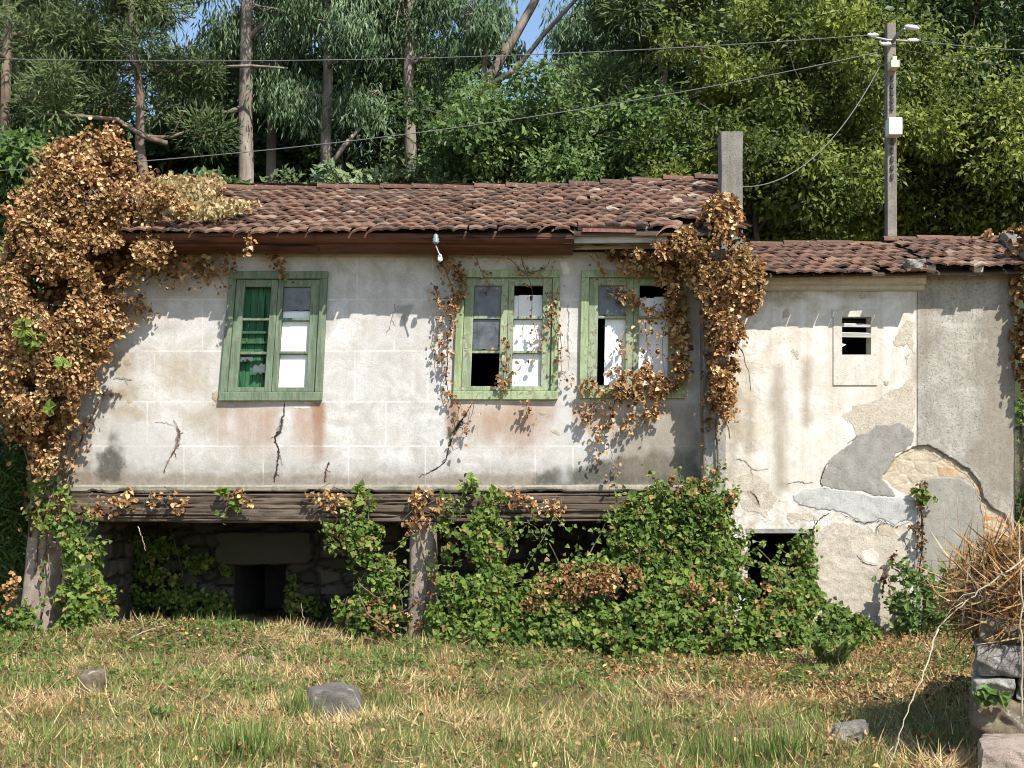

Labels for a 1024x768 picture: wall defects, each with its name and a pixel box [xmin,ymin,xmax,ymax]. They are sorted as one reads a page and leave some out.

leakage [78,434,124,484]
crack [155,420,181,473]
crack [274,402,285,482]
peeling [842,378,916,444]
peeling [733,472,780,518]
flaking render [882,445,1010,550]
peeling [787,513,926,620]